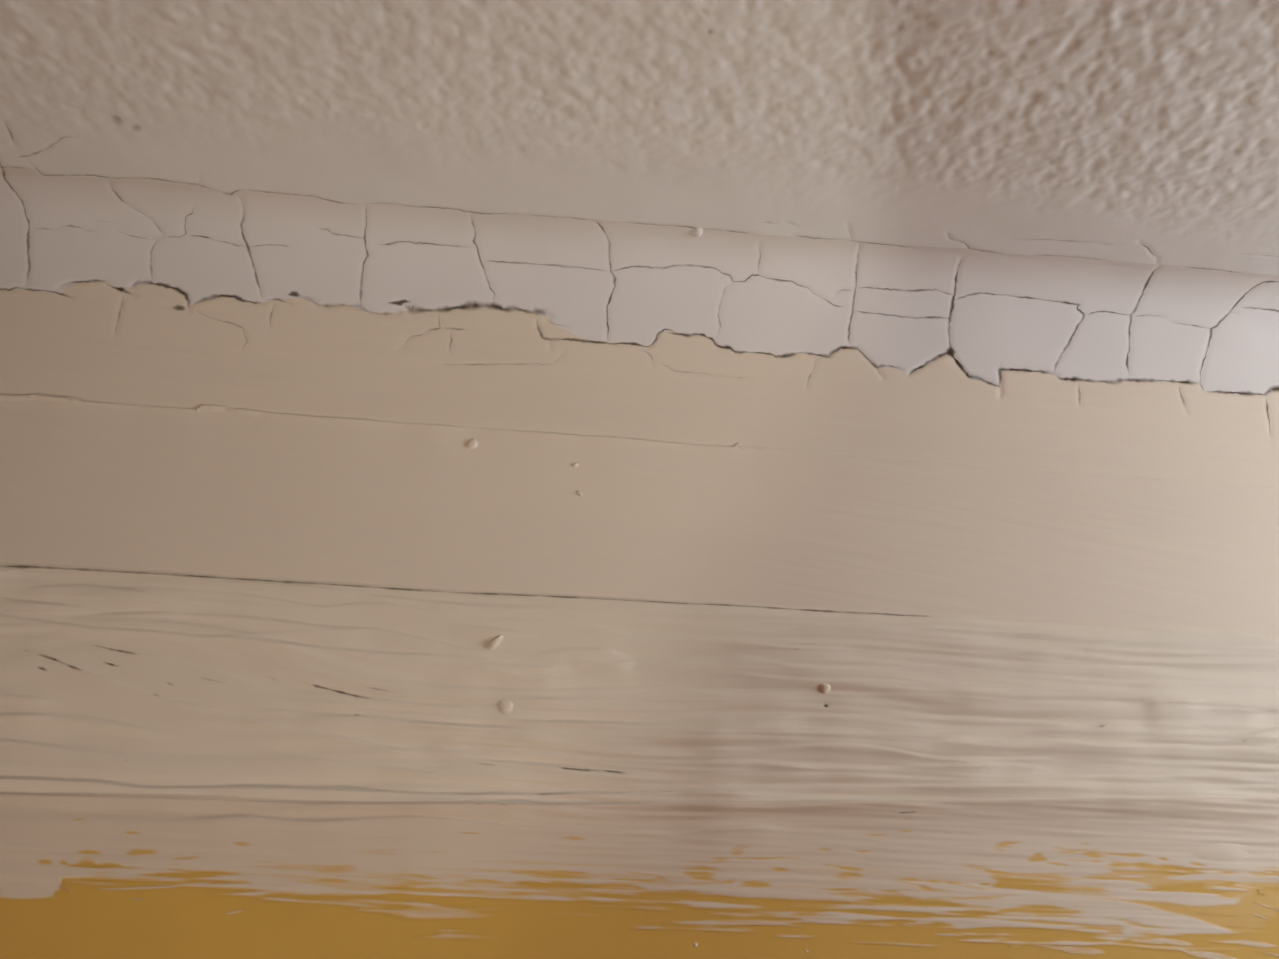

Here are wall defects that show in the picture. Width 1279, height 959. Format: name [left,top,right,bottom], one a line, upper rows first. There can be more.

crack [3,173,258,303]
crack [429,207,887,367]
crack [914,242,1279,423]